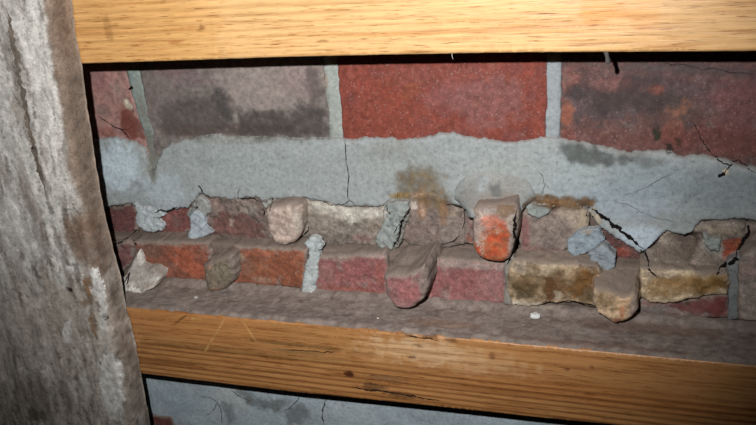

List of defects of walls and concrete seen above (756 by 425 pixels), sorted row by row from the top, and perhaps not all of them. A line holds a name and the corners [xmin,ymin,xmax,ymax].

crack [693,123,756,173]
peeling [121,248,168,293]
peeling [134,201,167,232]
peeling [186,194,215,239]
peeling [298,234,325,303]
crack [303,139,411,263]
peeling [375,199,410,250]
spalling [474,224,511,261]
peeling [525,202,552,219]
leakage [513,268,596,307]
peeling [567,225,617,270]
crack [586,174,696,277]